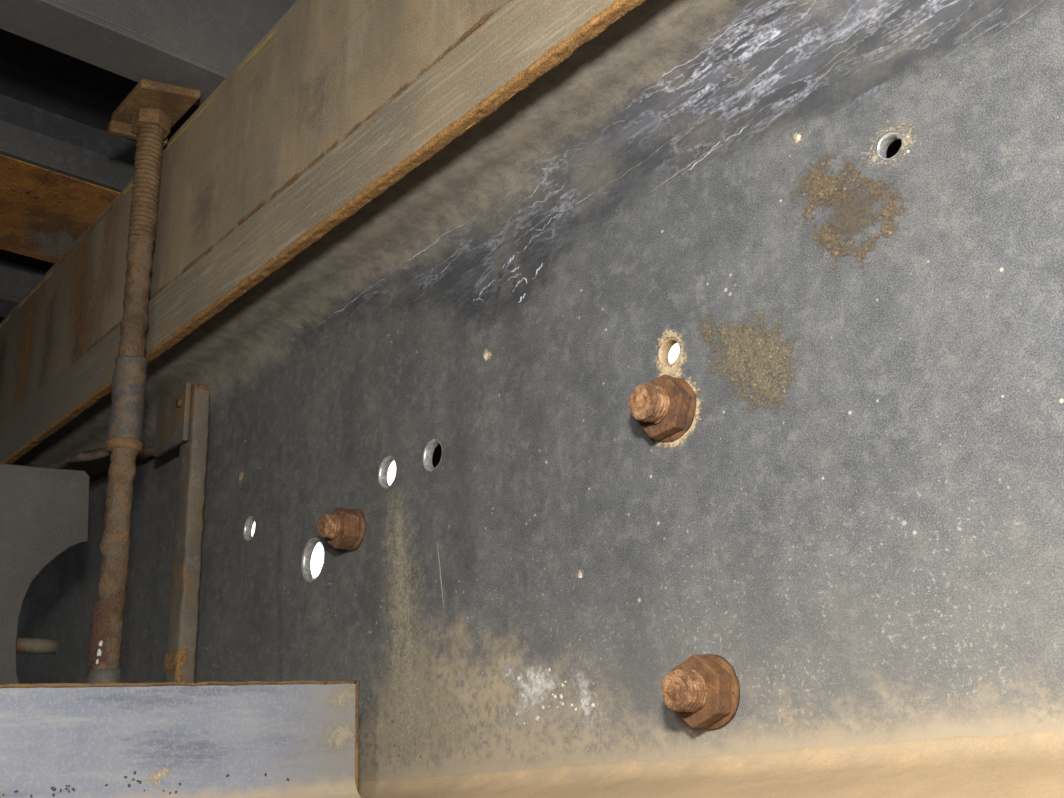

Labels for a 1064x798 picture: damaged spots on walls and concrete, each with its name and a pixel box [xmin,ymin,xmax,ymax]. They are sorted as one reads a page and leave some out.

rust [145,0,645,363]
rust [791,120,916,271]
rust [698,313,797,413]
rust [0,379,113,464]
water stain [505,667,595,725]